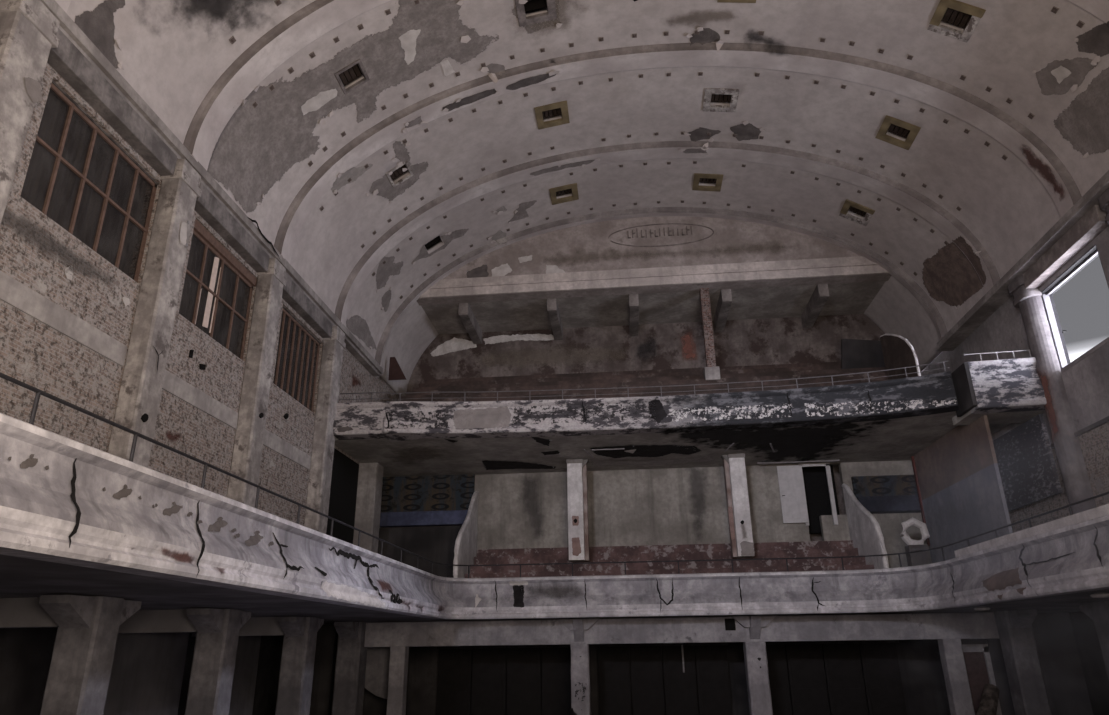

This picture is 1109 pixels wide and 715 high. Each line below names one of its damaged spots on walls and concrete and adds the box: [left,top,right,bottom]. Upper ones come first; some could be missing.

peeling [75,0,125,70]
peeling [207,0,562,213]
peeling [1032,21,1109,159]
peeling [922,236,986,309]
peeling [383,410,457,443]
peeling [483,437,560,470]
peeling [590,445,702,460]
peeling [512,397,956,425]
crack [69,458,81,548]
crack [196,500,205,577]
crack [273,533,403,604]